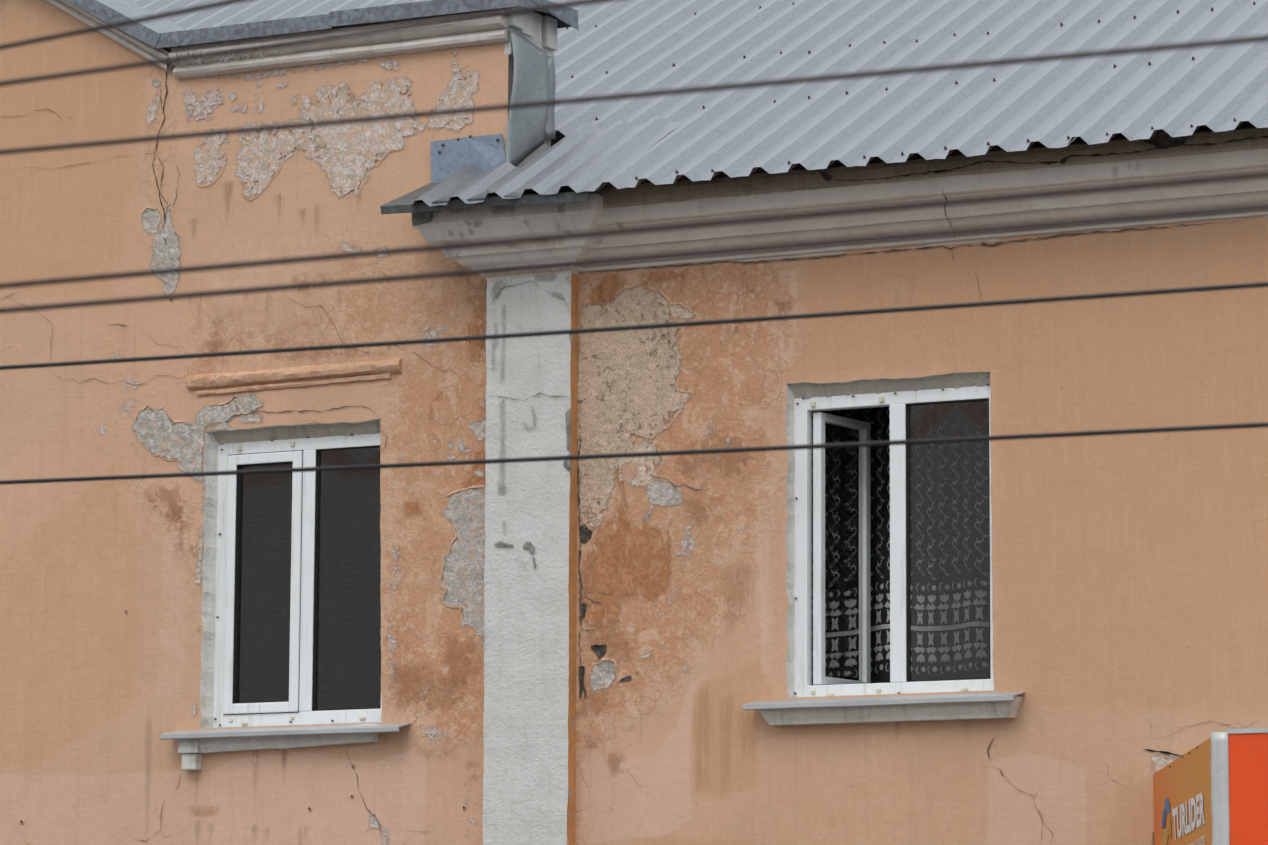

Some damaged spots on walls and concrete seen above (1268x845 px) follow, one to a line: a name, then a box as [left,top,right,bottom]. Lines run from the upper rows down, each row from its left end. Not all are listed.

crack [25,51,180,282]
peeling [182,51,479,202]
spalling [132,392,263,508]
spalling [447,417,486,459]
spalling [564,284,698,557]
spalling [438,470,536,651]
spalling [579,645,637,699]
crack [345,747,428,845]
crack [987,738,1053,844]